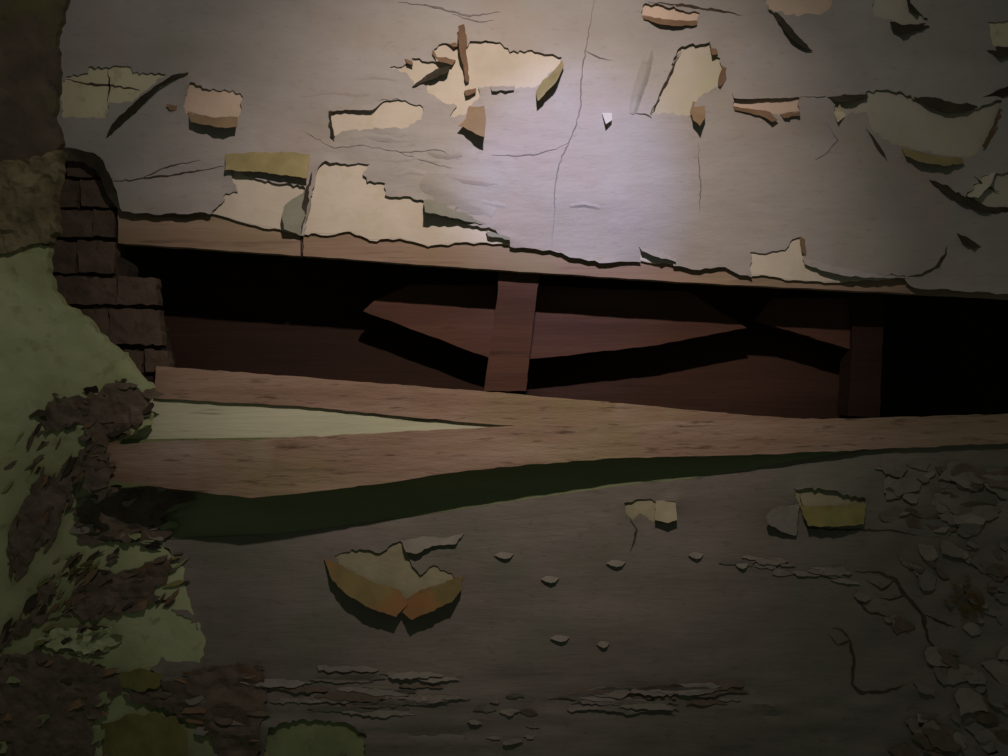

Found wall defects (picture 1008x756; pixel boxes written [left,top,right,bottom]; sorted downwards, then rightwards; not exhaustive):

peeling [61,66,243,138]
peeling [328,98,424,138]
peeling [390,24,564,137]
crack [502,0,608,234]
peeling [650,42,727,126]
peeling [732,86,1008,166]
peeling [212,151,510,246]
peeling [750,236,905,282]
flaking render [0,147,196,756]
peeling [324,533,464,620]
crack [856,571,955,646]
crack [828,628,907,695]